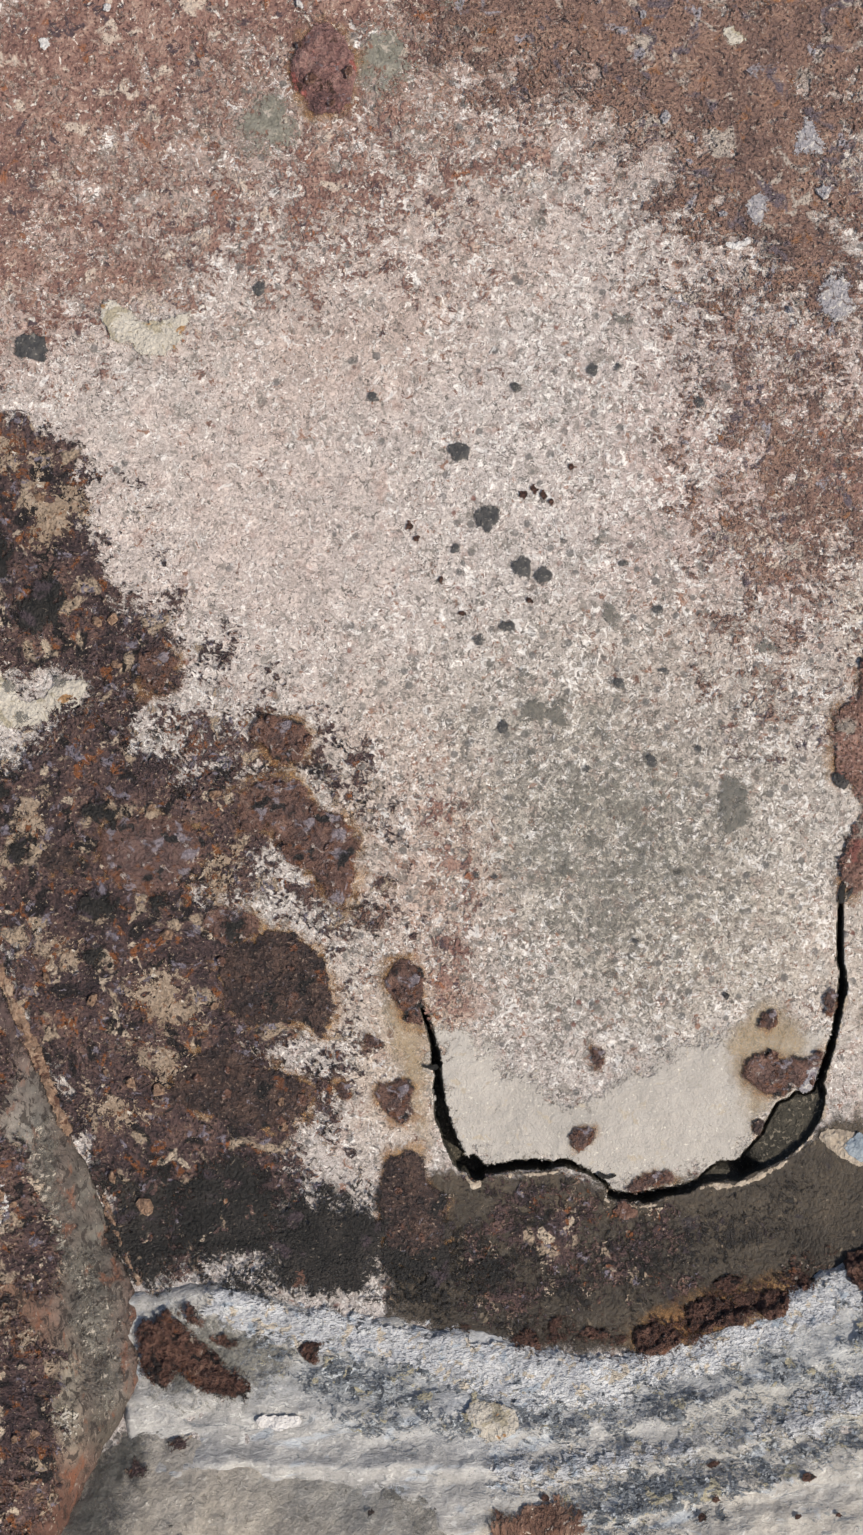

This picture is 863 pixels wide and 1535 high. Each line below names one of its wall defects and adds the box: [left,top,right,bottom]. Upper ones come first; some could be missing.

rust [0,0,863,897]
rust [0,364,489,1535]
rust [569,1125,597,1153]
rust [376,1144,838,1368]
crack [419,880,849,1208]
rust [490,1494,587,1535]